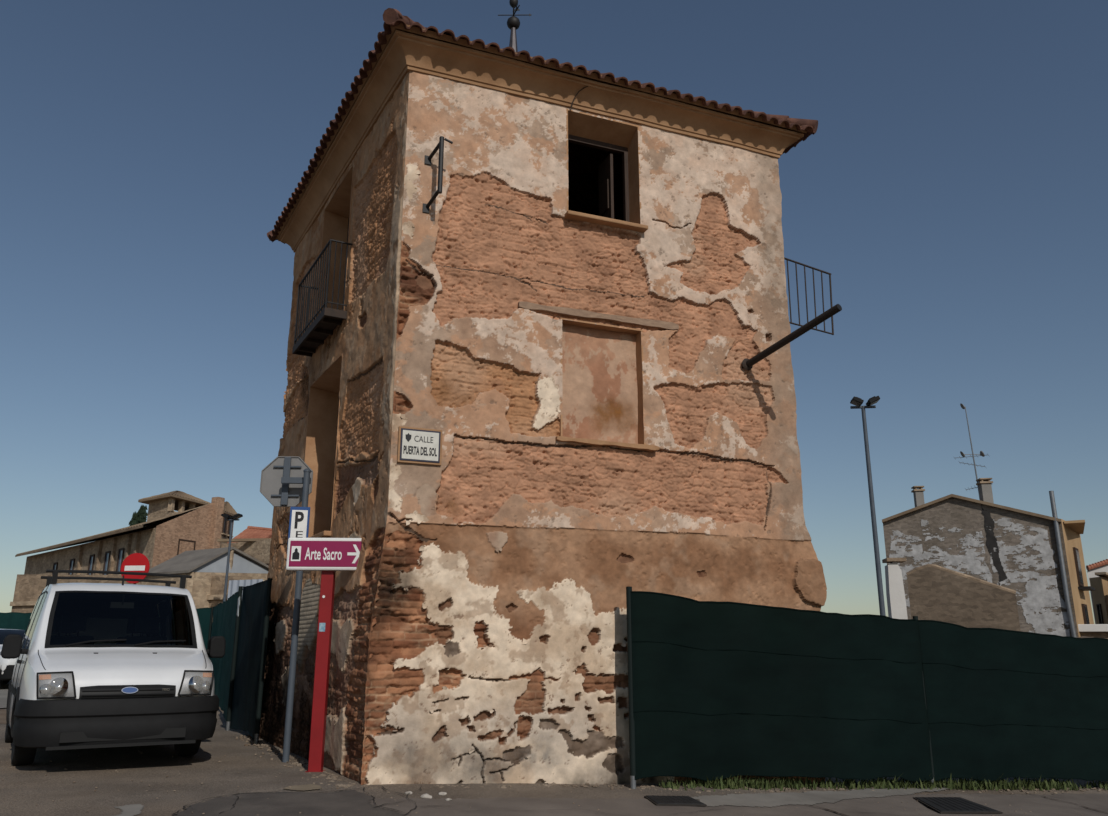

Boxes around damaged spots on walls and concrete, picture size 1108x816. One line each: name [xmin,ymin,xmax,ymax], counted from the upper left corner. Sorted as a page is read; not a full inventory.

spalling [348,129,421,329]
spalling [334,171,789,552]
spalling [278,512,290,559]
peeling [274,577,320,706]
peeling [331,617,355,672]
peeling [366,542,674,785]
peeling [889,518,1070,636]
peeling [324,707,347,774]